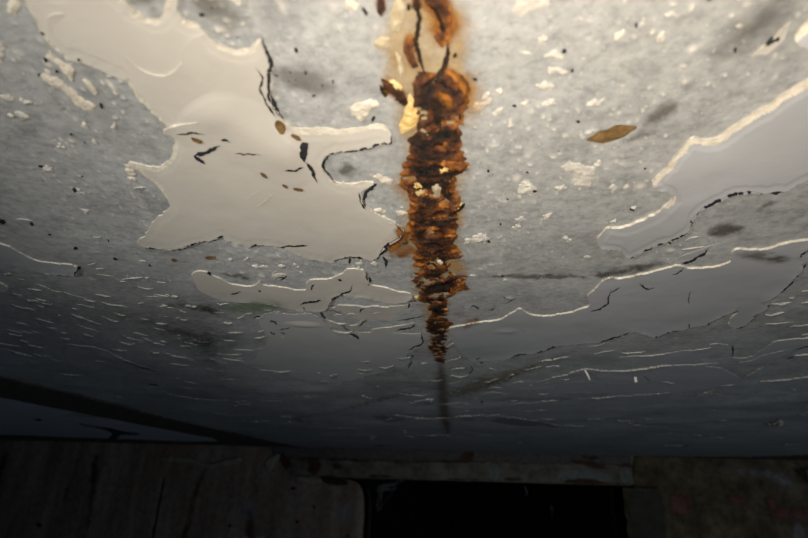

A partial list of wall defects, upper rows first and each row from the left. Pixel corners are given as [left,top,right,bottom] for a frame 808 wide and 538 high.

peeling [0,0,425,343]
corrosion [362,0,474,430]
peeling [536,34,574,107]
peeling [446,79,808,427]
peeling [751,20,808,57]